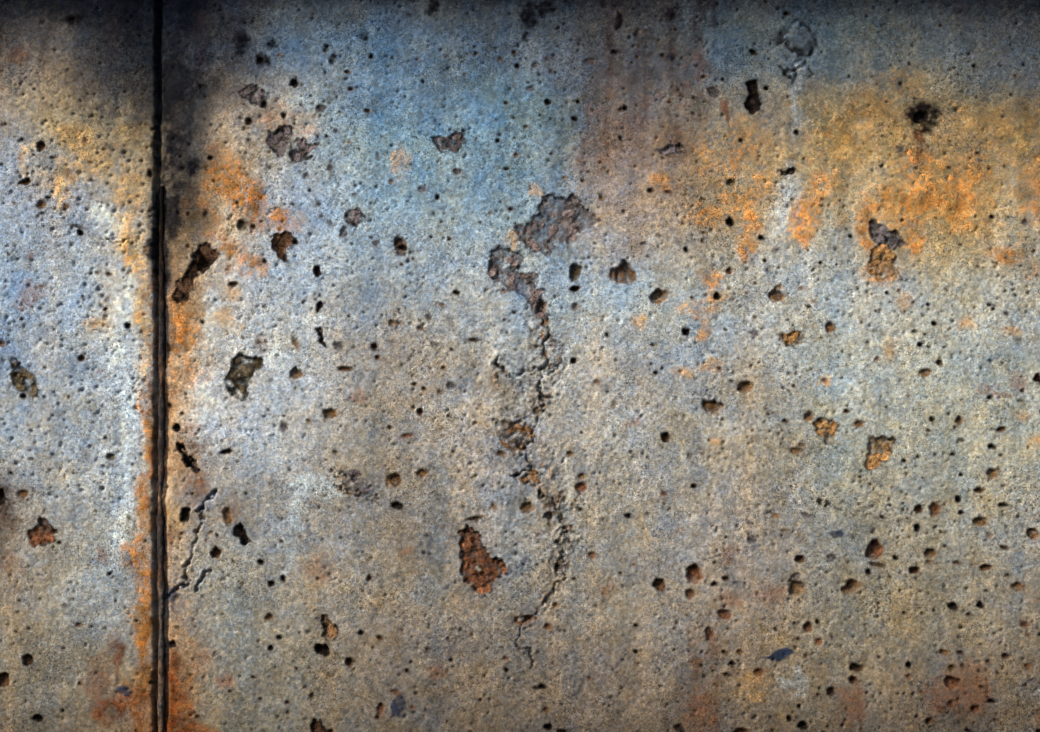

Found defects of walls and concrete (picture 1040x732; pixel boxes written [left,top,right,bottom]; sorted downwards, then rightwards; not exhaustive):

rust [187,156,288,234]
rust [793,175,829,245]
rust [857,133,980,254]
spalling [172,242,219,304]
peeling [488,192,595,318]
spalling [867,218,905,281]
rust [166,301,196,352]
spalling [226,355,263,401]
crack [515,319,555,437]
rust [92,381,205,732]
spalling [458,516,507,594]
crack [511,466,580,620]